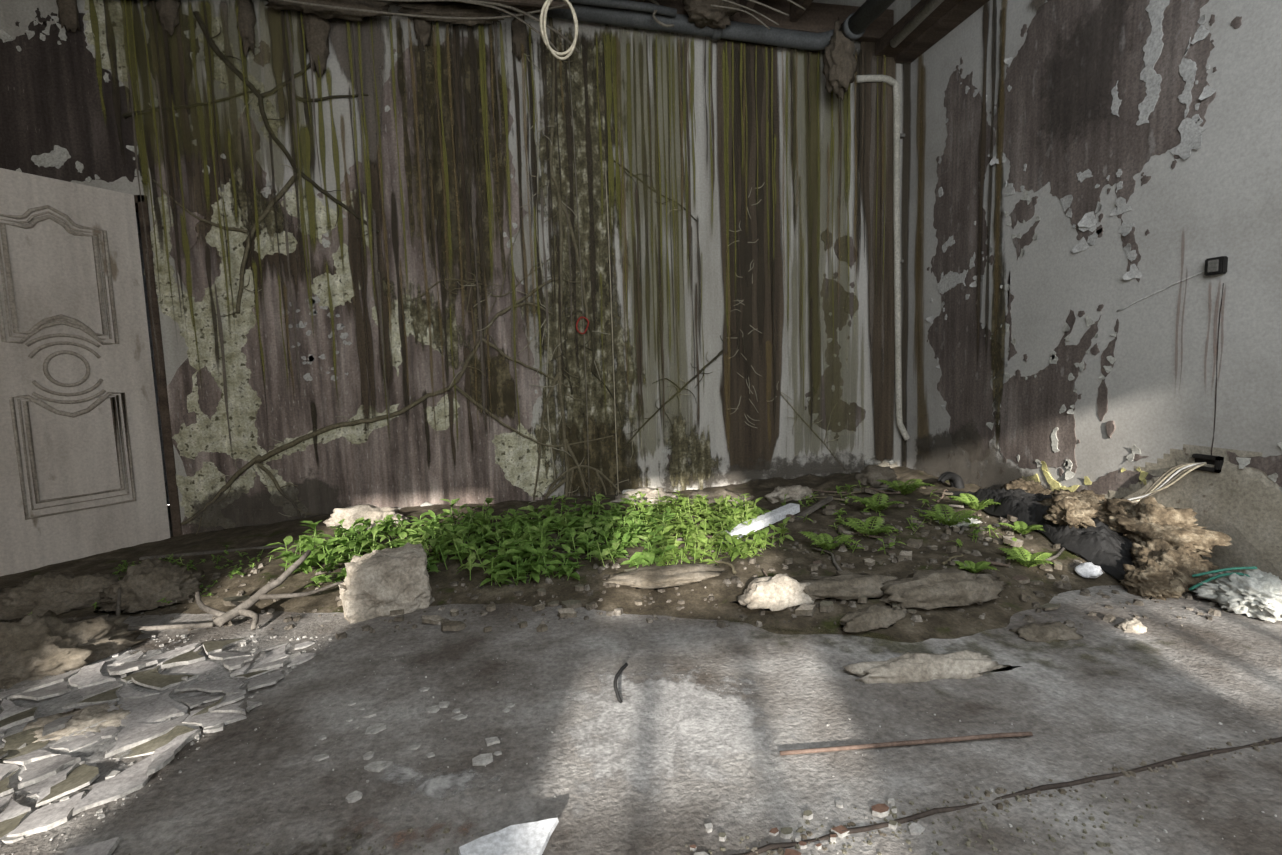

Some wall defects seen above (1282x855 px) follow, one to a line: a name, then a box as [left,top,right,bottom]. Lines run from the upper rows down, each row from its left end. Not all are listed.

damp [191,402,344,534]
peeling [0,2,559,535]
damp [89,0,1054,497]
peeling [926,0,1242,495]